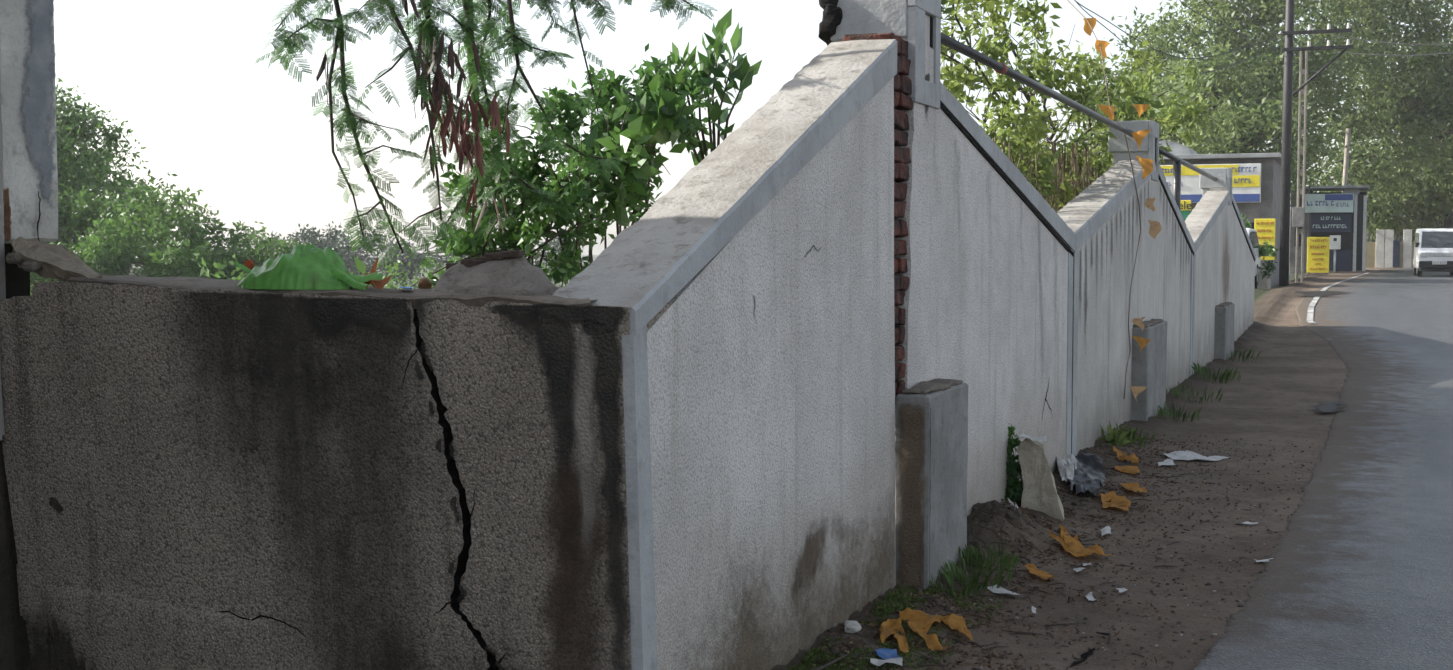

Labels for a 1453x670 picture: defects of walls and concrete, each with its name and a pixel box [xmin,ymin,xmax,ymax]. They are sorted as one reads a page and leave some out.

water stain [191,293,423,535]
crack [403,309,505,670]
water stain [492,304,627,670]